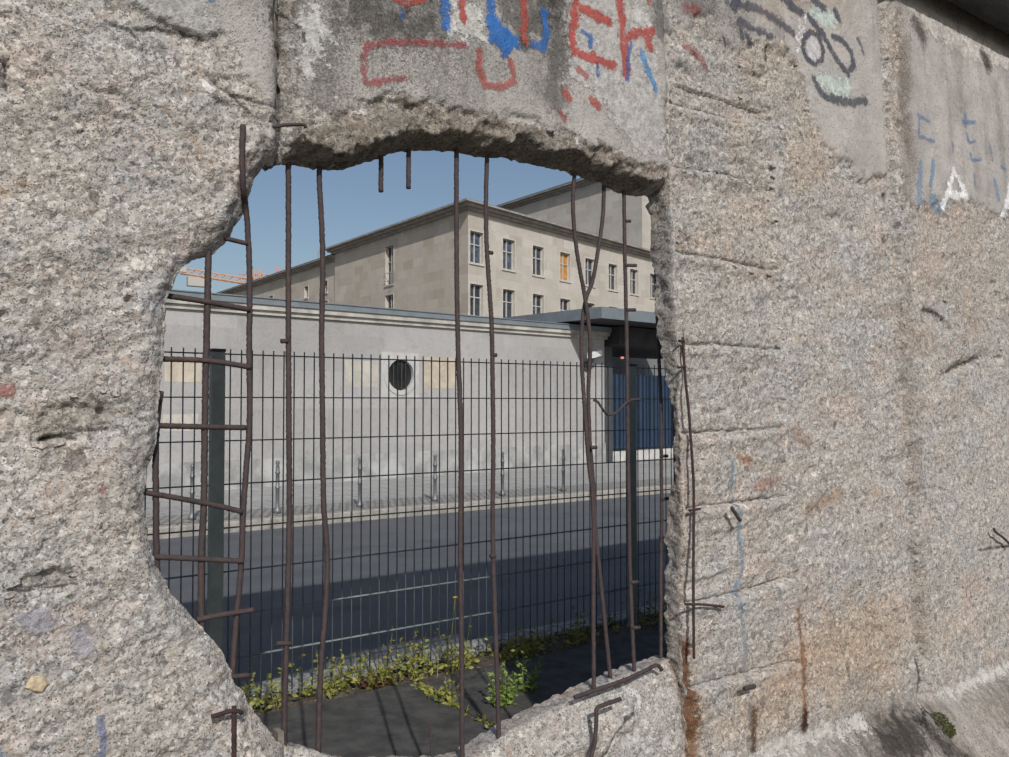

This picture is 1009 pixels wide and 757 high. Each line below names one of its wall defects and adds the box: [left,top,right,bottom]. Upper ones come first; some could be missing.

spalling [275,0,854,757]
rust [670,637,703,757]
rust [797,608,808,732]